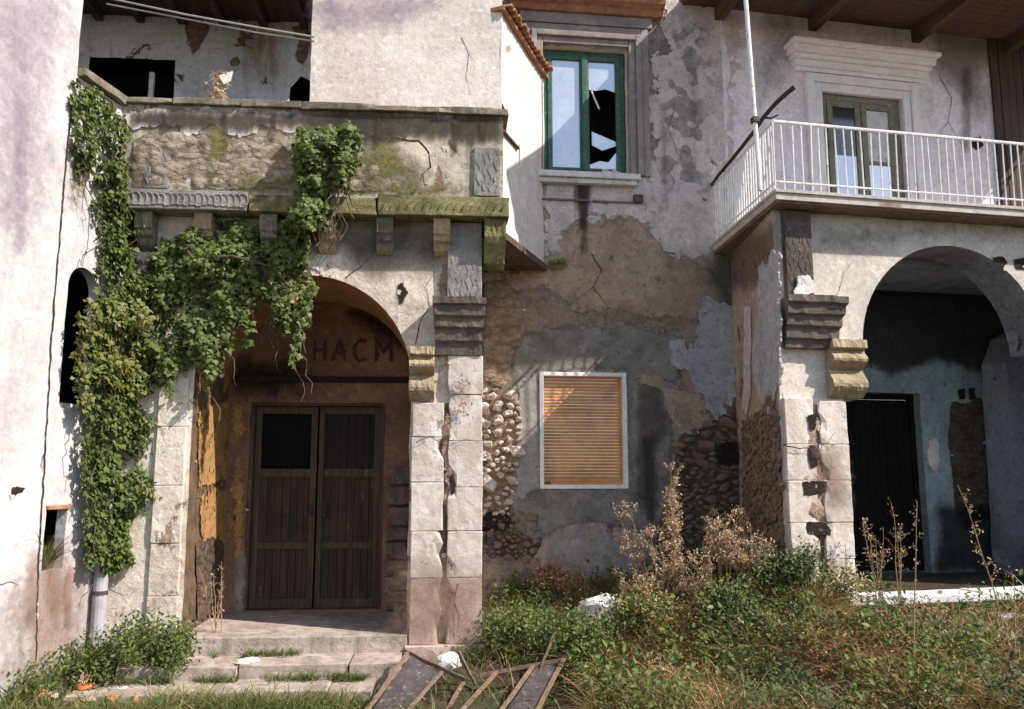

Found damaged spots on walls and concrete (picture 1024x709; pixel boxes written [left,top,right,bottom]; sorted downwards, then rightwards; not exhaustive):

peeling [185,18,209,54]
peeling [268,21,312,64]
crack [382,137,431,187]
water stain [575,185,590,249]
crack [580,253,616,323]
peeling [437,211,728,604]
peeling [195,398,249,623]
flaking render [639,368,785,576]
spalling [801,414,844,536]
peeling [926,388,993,573]